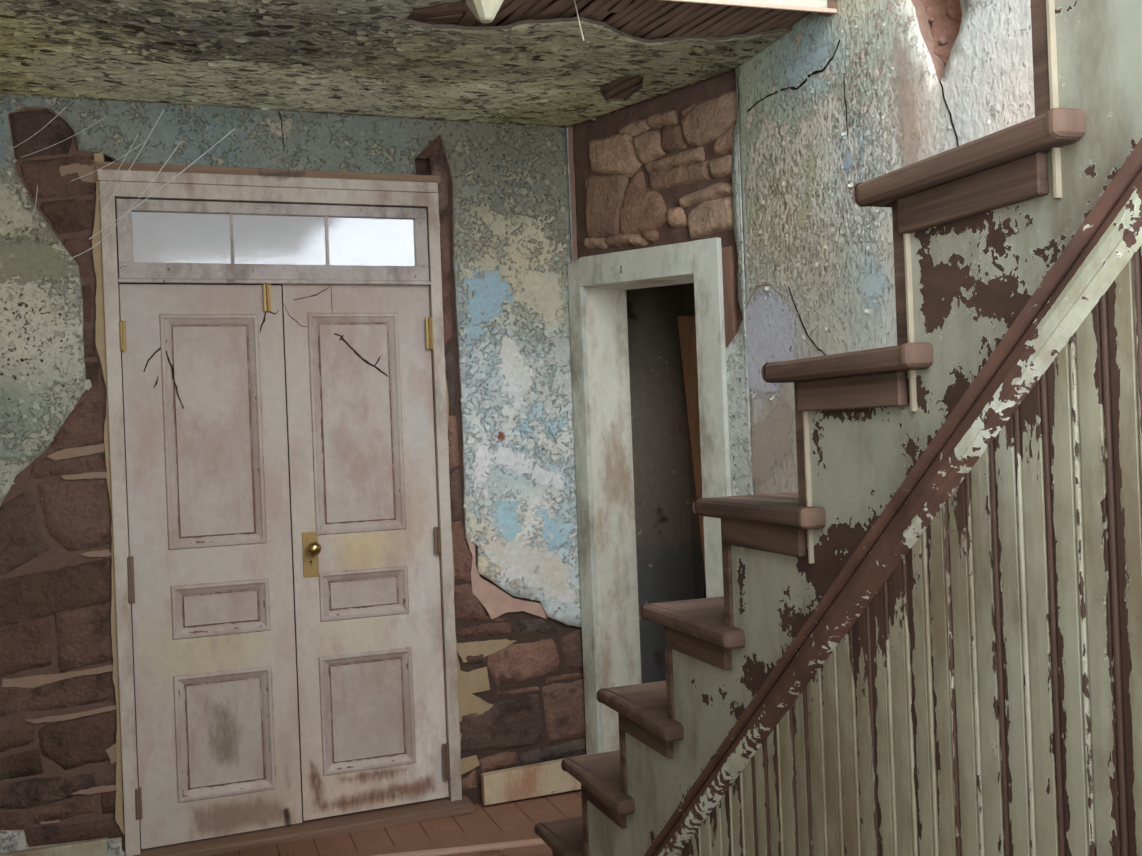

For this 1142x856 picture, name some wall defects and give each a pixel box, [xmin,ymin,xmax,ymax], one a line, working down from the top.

spalling [921,0,971,67]
crack [737,39,848,136]
crack [940,80,959,146]
crack [745,284,825,355]